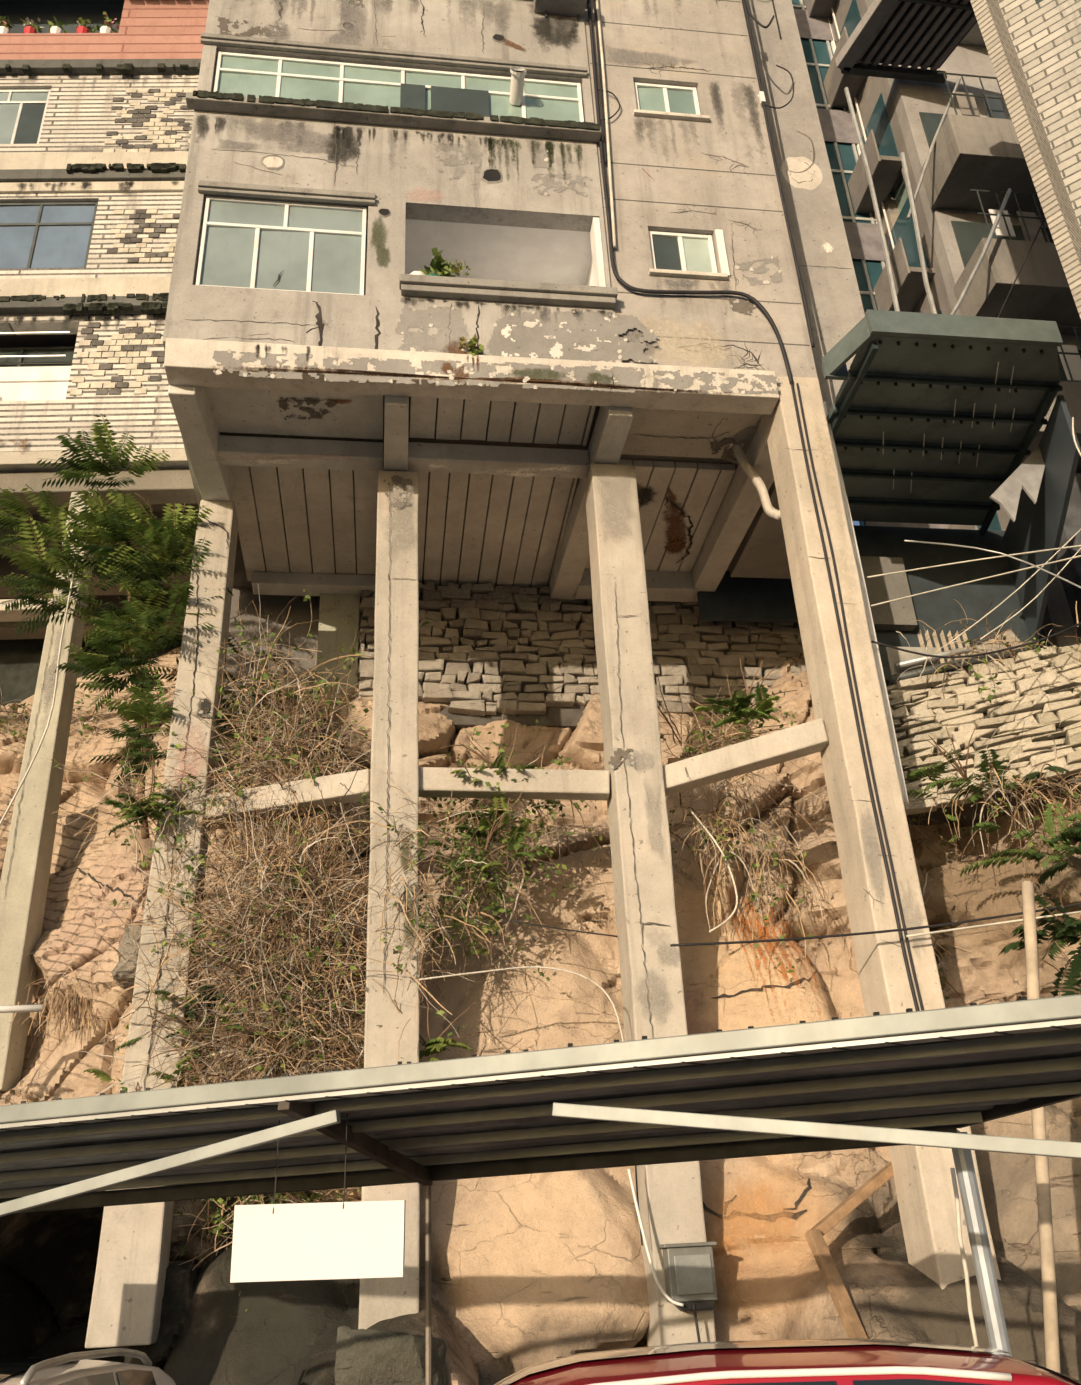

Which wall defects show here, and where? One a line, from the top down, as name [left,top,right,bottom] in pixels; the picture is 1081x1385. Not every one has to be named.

leakage [330,0,365,45]
leakage [534,17,578,46]
leakage [197,115,375,163]
leakage [394,132,582,168]
crack [187,301,327,346]
crack [374,307,382,349]
peeling [212,301,780,394]